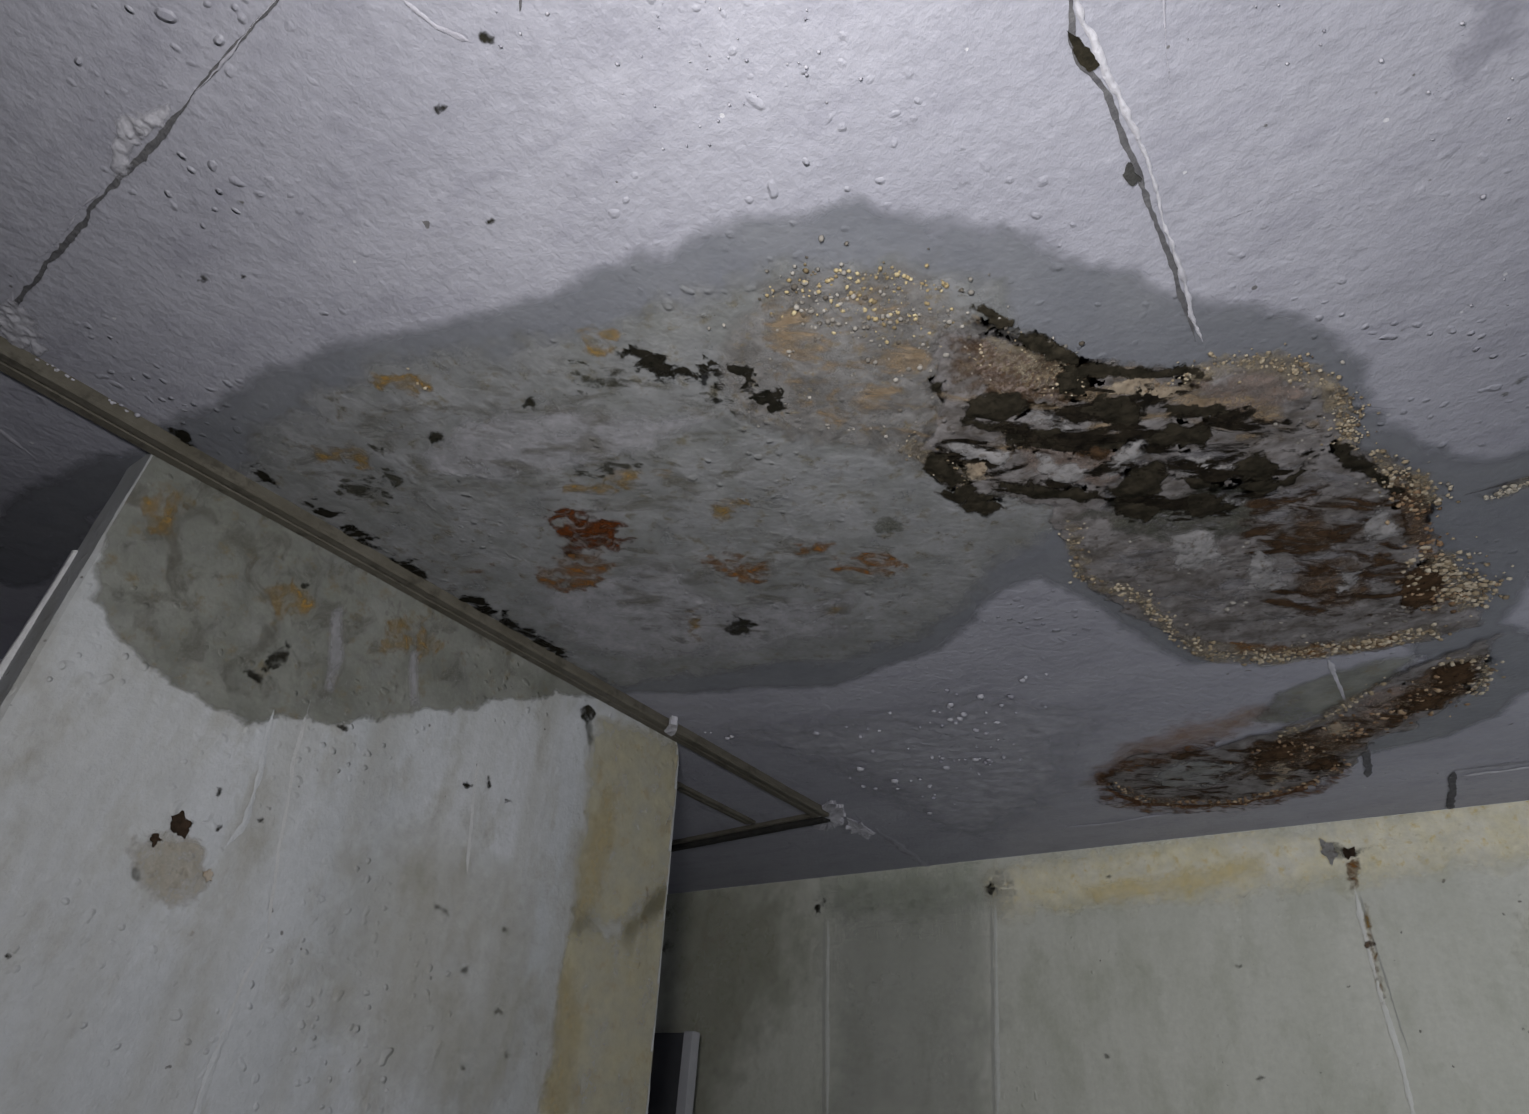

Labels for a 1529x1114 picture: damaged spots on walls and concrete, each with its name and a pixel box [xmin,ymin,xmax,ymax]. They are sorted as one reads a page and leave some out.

crack [0,0,279,327]
crack [1067,0,1203,342]
damp [0,452,589,725]
rust [537,472,636,593]
damp [160,204,1529,751]
spalling [707,241,1514,814]
spalling [133,810,213,902]
damp [540,720,678,1114]
damp [986,801,1529,910]
crack [1354,886,1416,1114]